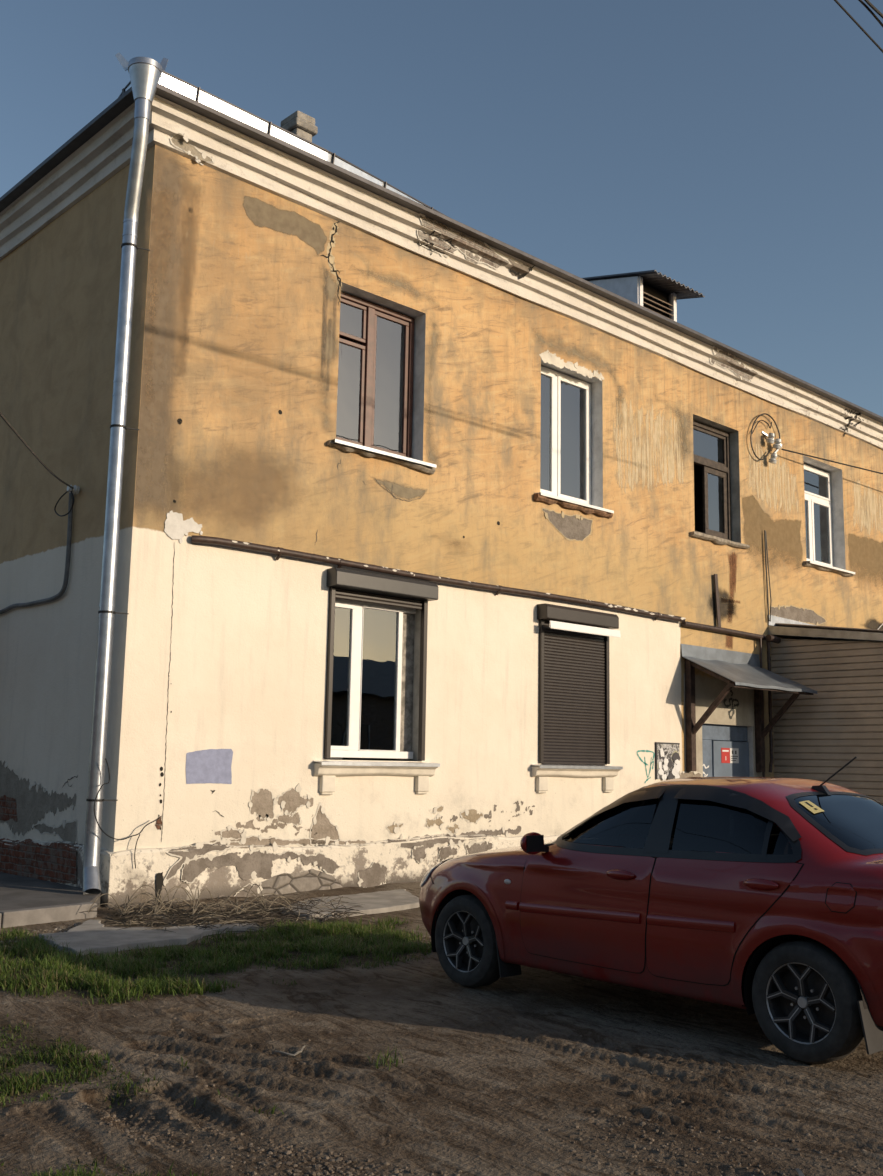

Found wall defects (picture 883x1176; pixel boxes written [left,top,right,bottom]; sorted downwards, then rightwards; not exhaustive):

peeling [170,131,216,165]
damp [243,196,327,254]
crack [320,221,342,304]
damp [134,152,187,511]
damp [742,443,803,563]
flaking render [0,760,82,884]
peeling [156,783,535,900]